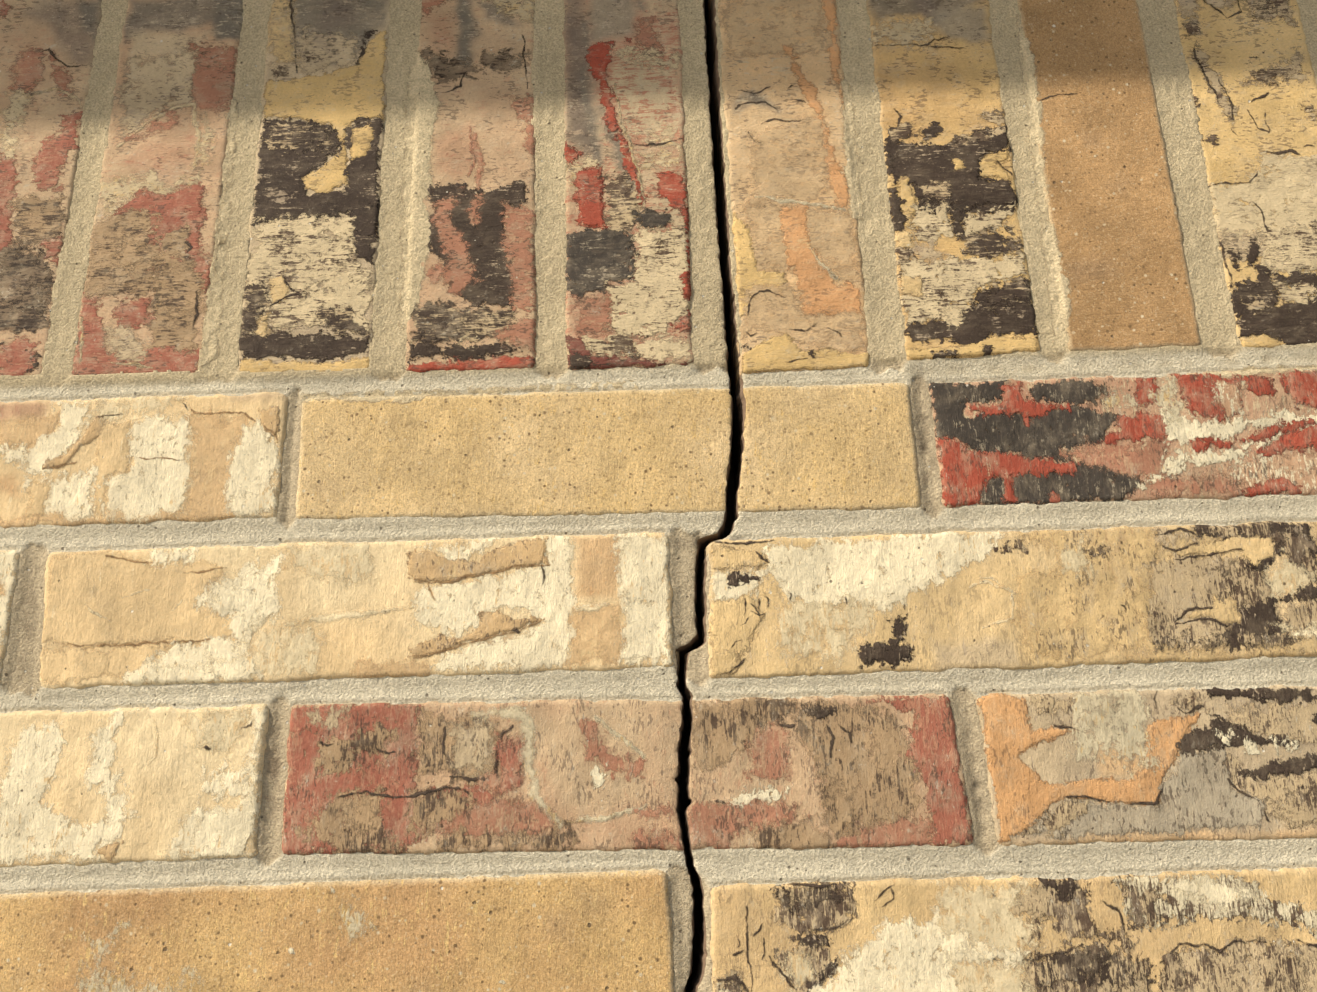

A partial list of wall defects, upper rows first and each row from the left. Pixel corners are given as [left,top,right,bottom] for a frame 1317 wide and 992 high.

crack [675,0,746,992]